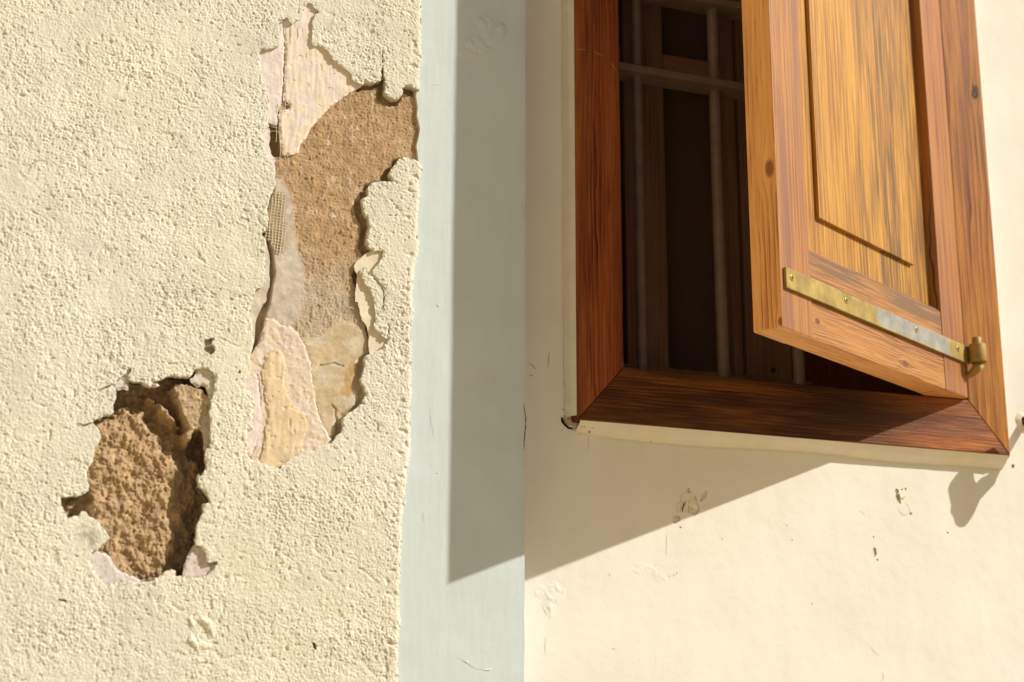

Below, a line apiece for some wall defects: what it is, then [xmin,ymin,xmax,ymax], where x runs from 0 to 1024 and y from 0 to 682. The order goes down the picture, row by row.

flaking render [238,4,421,469]
spalling [61,369,217,585]
flaking render [673,488,707,528]